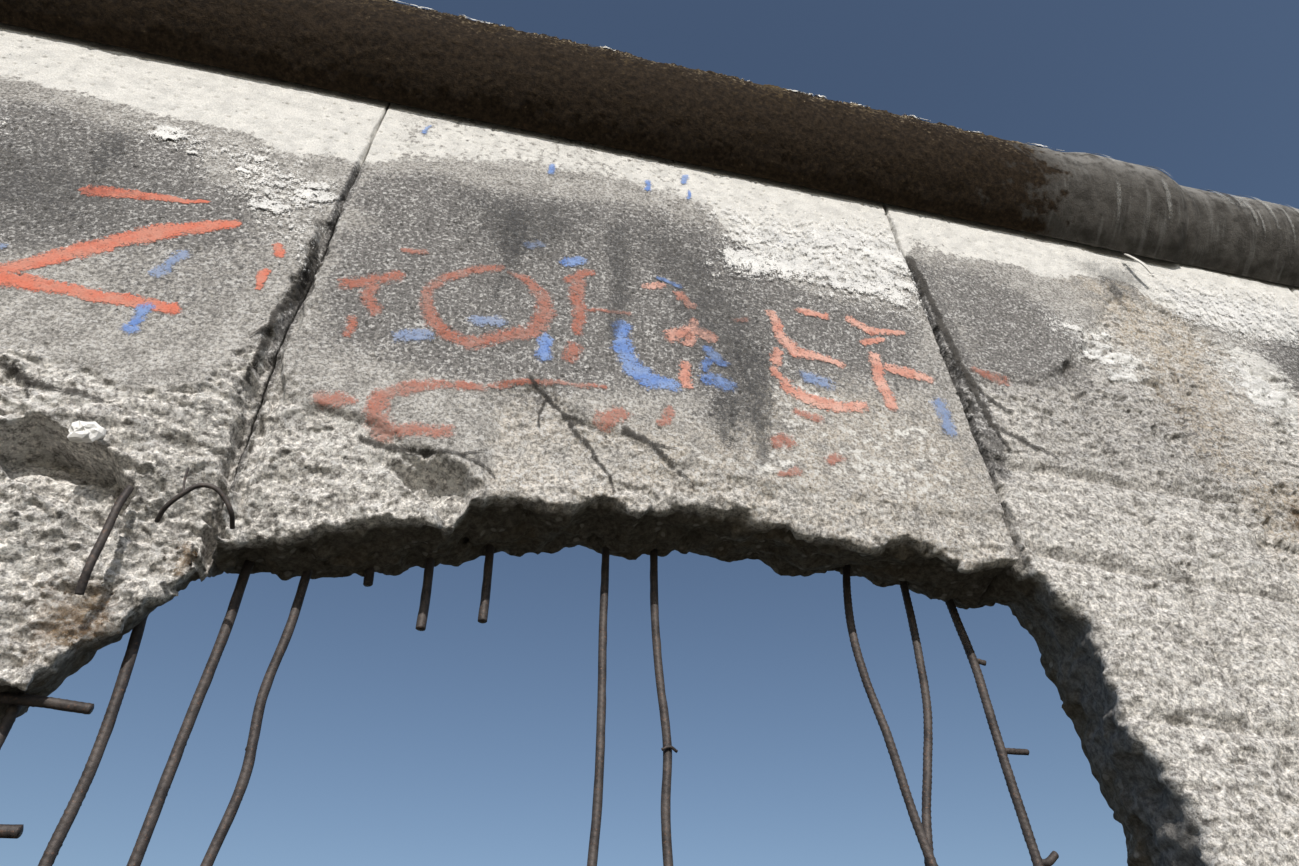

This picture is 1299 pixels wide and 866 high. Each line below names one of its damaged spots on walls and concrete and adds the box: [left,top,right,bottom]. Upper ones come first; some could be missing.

corrosion [74,485,134,595]
spalling [0,260,1299,866]